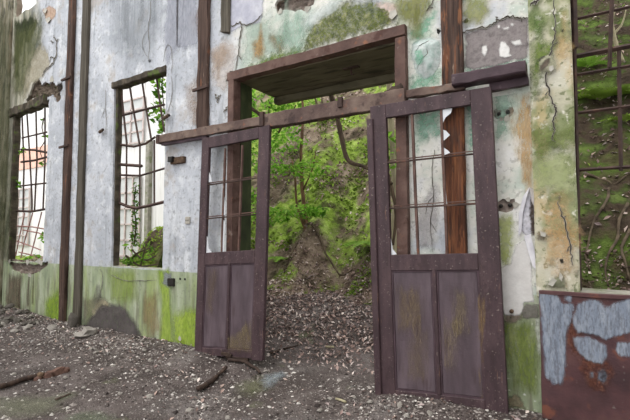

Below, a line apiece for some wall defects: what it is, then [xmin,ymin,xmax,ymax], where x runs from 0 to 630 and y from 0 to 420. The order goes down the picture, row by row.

leakage [13,16,37,63]
flaking render [22,46,63,104]
crack [215,15,261,112]
flaking render [278,0,315,14]
peeling [465,17,529,70]
crack [463,0,558,142]
corrosion [516,100,532,178]
flaking render [498,188,546,269]
crack [557,196,573,266]
leakage [6,276,21,308]
leakage [84,300,141,336]
corrosion [566,312,612,390]